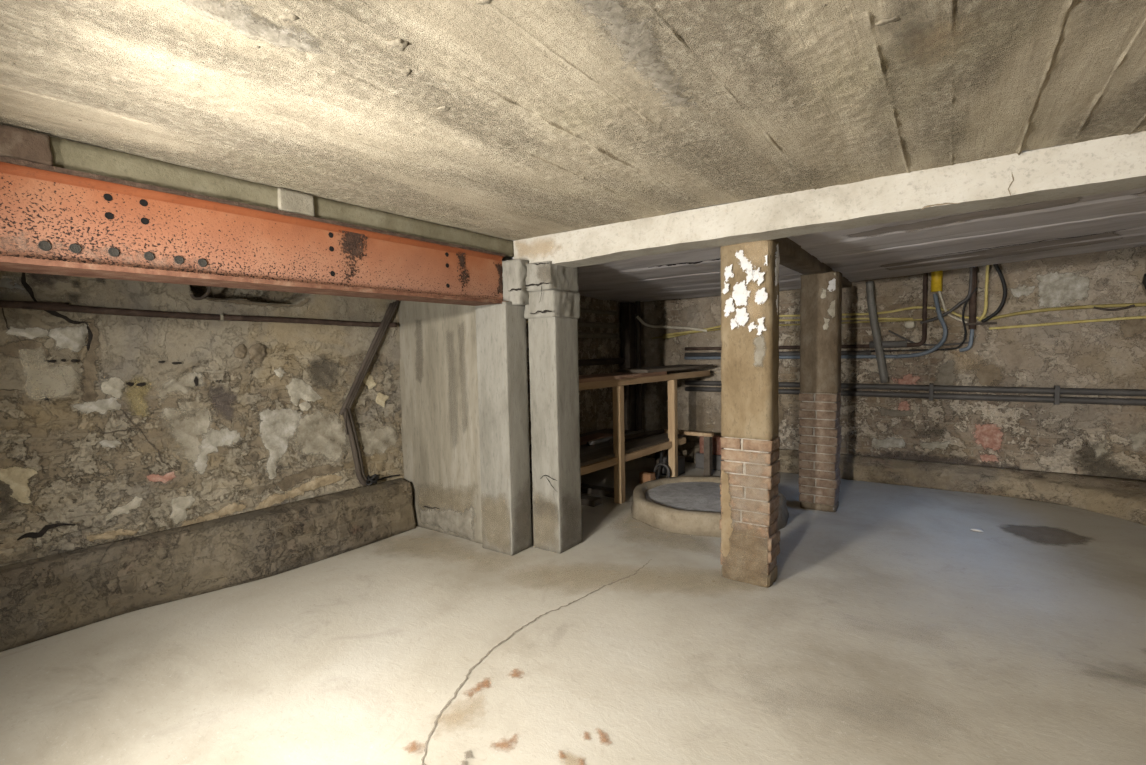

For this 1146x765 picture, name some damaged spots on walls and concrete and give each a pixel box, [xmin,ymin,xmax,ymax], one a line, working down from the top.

rust [85,247,210,271]
rust [337,230,368,285]
rust [456,252,469,295]
peeling [722,245,780,335]
peeling [821,273,836,330]
peeling [0,318,121,414]
peeling [274,367,322,411]
peeling [0,466,38,504]
peeling [103,496,143,521]
peeling [170,495,195,526]
damp [1004,525,1089,546]
crack [421,559,652,765]